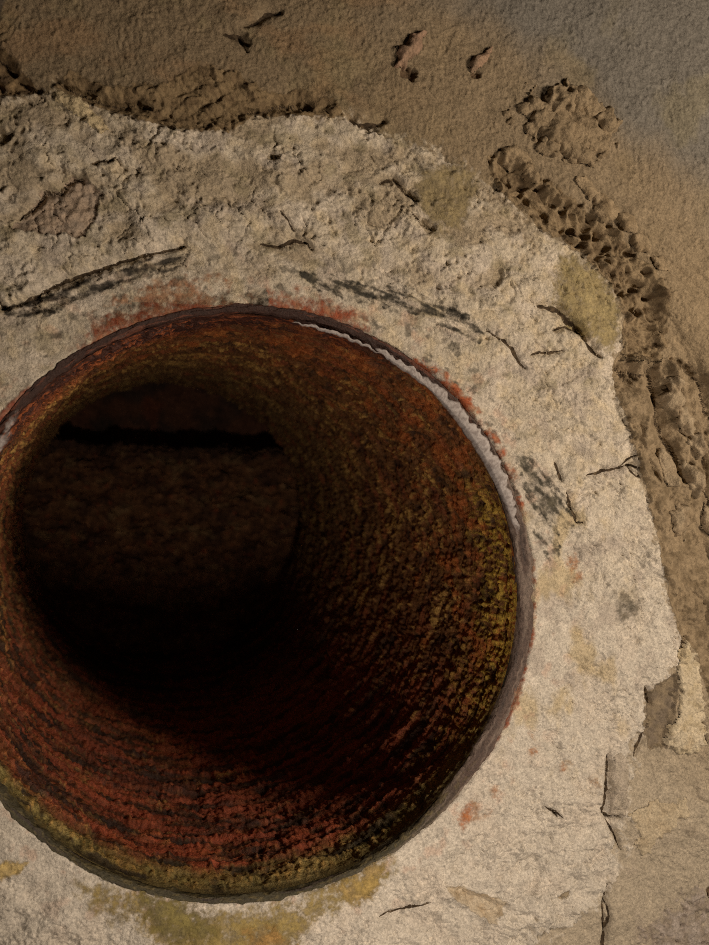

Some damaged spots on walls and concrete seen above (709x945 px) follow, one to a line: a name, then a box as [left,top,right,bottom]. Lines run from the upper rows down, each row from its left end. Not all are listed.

spalling [53,60,345,134]
peeling [12,176,103,238]
crack [0,246,185,311]
spalling [3,257,187,317]
rust [92,280,232,341]
rust [266,288,366,331]
spalling [299,271,484,344]
rust [414,359,481,414]
spalling [487,147,709,755]
rust [460,802,477,826]
crack [600,755,620,847]
crack [600,884,610,945]